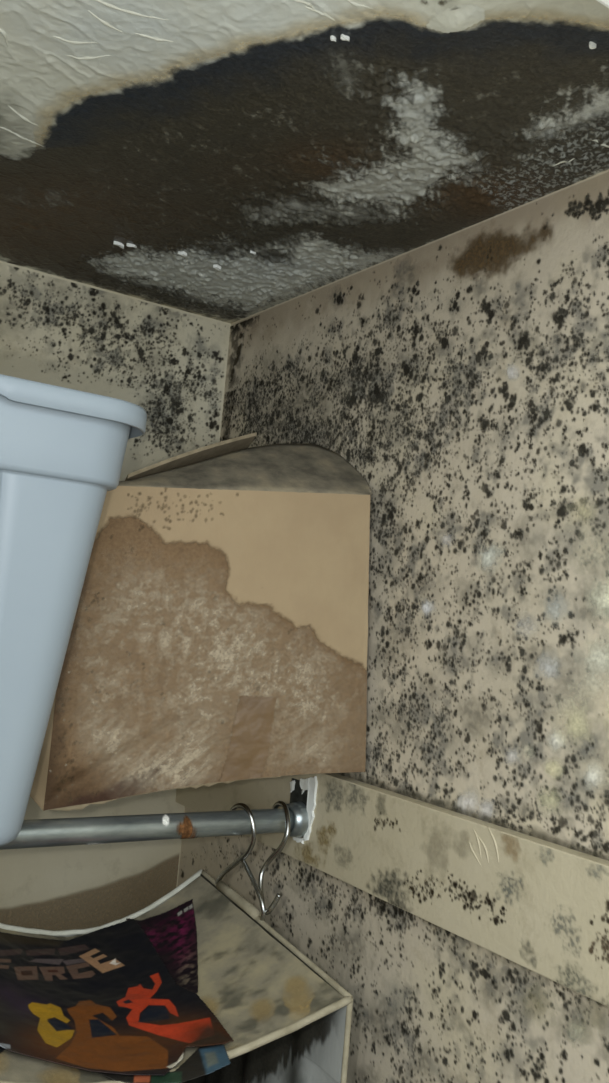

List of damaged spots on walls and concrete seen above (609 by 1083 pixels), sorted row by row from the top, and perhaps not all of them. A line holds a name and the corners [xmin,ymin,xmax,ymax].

leakage [0,19,609,861]
peeling [290,776,318,844]
leakage [0,856,194,940]
leakage [183,843,602,1083]
leakage [589,901,609,968]
leakage [72,1069,112,1082]